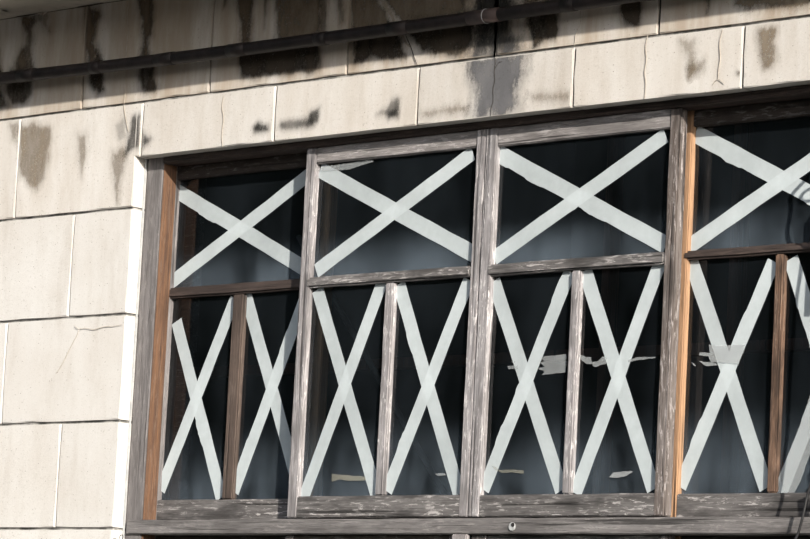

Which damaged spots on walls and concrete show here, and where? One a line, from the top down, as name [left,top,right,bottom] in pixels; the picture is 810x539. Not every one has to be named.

damp [138,67,157,92]
damp [239,46,321,78]
damp [353,36,407,64]
damp [338,0,512,28]
damp [410,20,522,117]
crack [490,60,502,116]
damp [526,13,559,48]
crack [712,29,724,85]
damp [759,28,776,67]
damp [281,110,319,128]
damp [18,125,50,187]
damp [116,116,149,168]